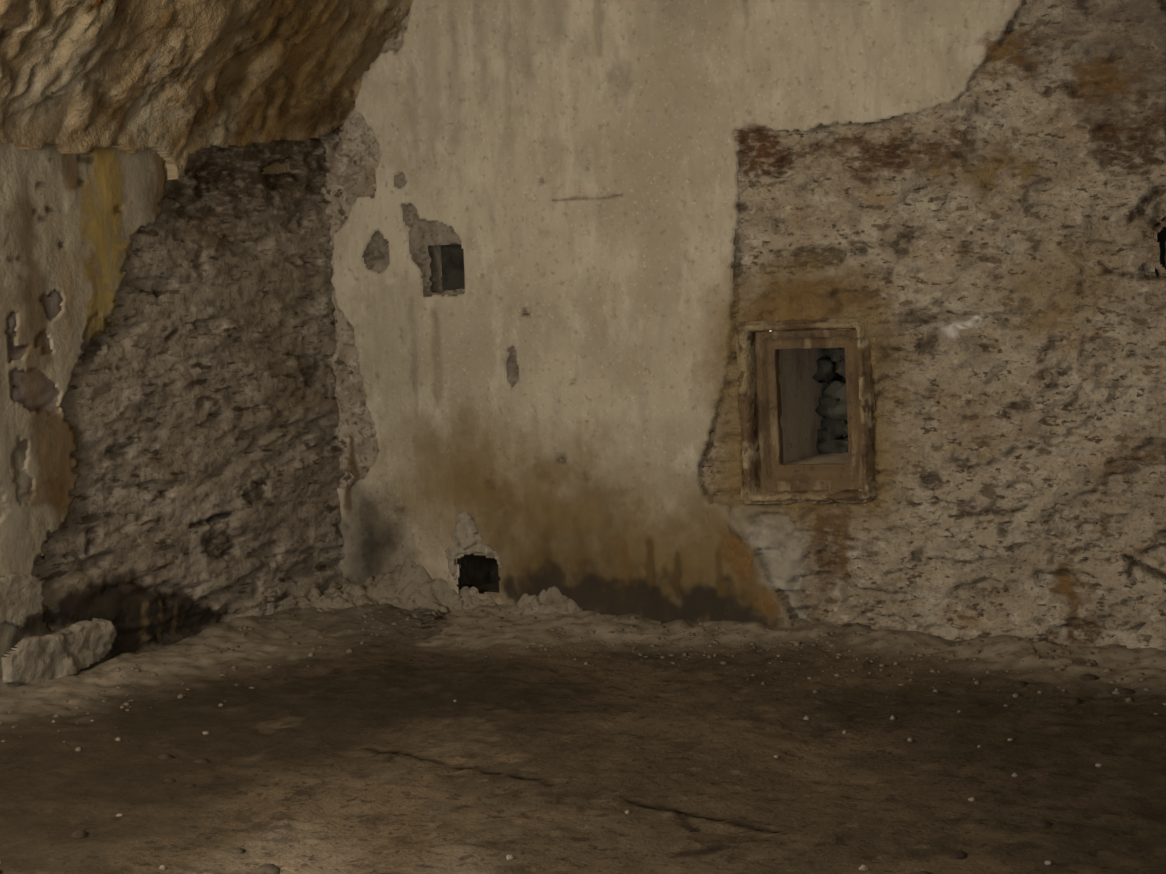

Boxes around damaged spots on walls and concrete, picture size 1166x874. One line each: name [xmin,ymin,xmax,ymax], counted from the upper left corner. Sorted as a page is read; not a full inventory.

flaking render [367,9,411,71]
flaking render [394,173,407,189]
flaking render [362,231,390,274]
flaking render [400,203,465,297]
flaking render [5,289,63,363]
flaking render [730,0,1166,650]
flaking render [33,109,381,637]
flaking render [698,348,741,512]
flaking render [11,437,33,504]
damp [346,440,357,507]
damp [355,503,396,578]
damp [453,463,785,628]